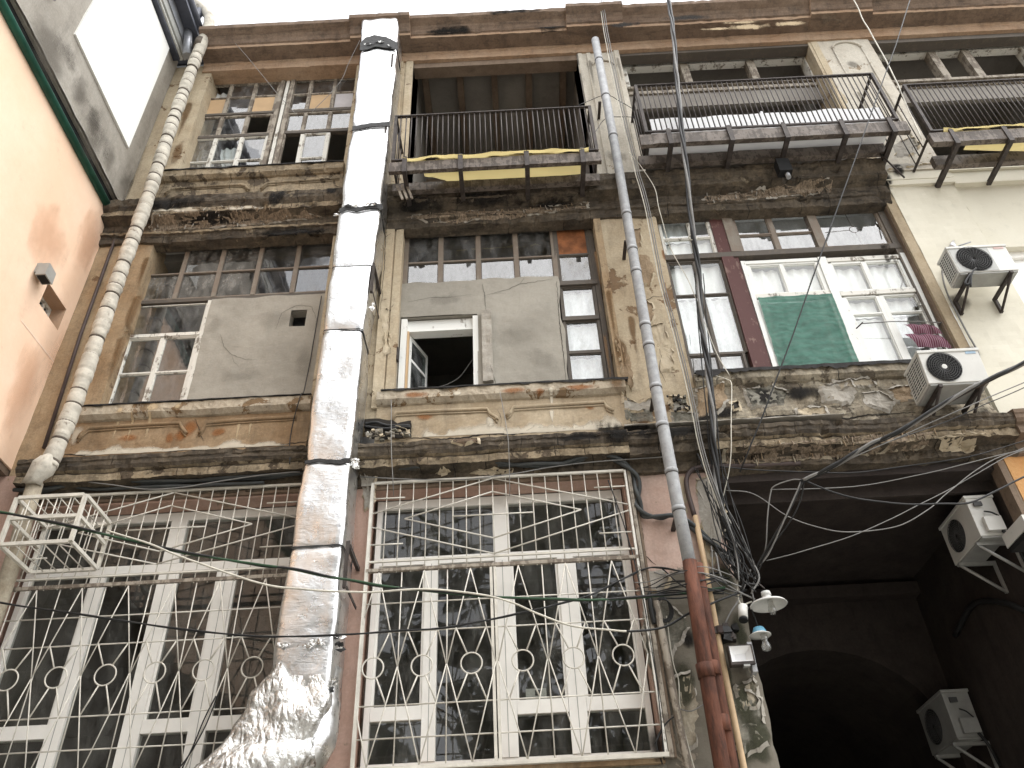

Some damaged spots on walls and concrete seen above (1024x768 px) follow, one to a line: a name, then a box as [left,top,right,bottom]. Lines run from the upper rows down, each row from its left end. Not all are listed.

spalling [701,176,833,204]
spalling [148,204,321,231]
spalling [407,201,590,224]
spalling [634,227,656,287]
spalling [646,300,675,373]
spalling [615,334,656,422]
spalling [666,376,915,422]
spalling [364,418,412,442]
spalling [451,437,481,446]
spalling [721,429,984,466]
spalling [360,474,378,513]
spalling [727,677,770,758]